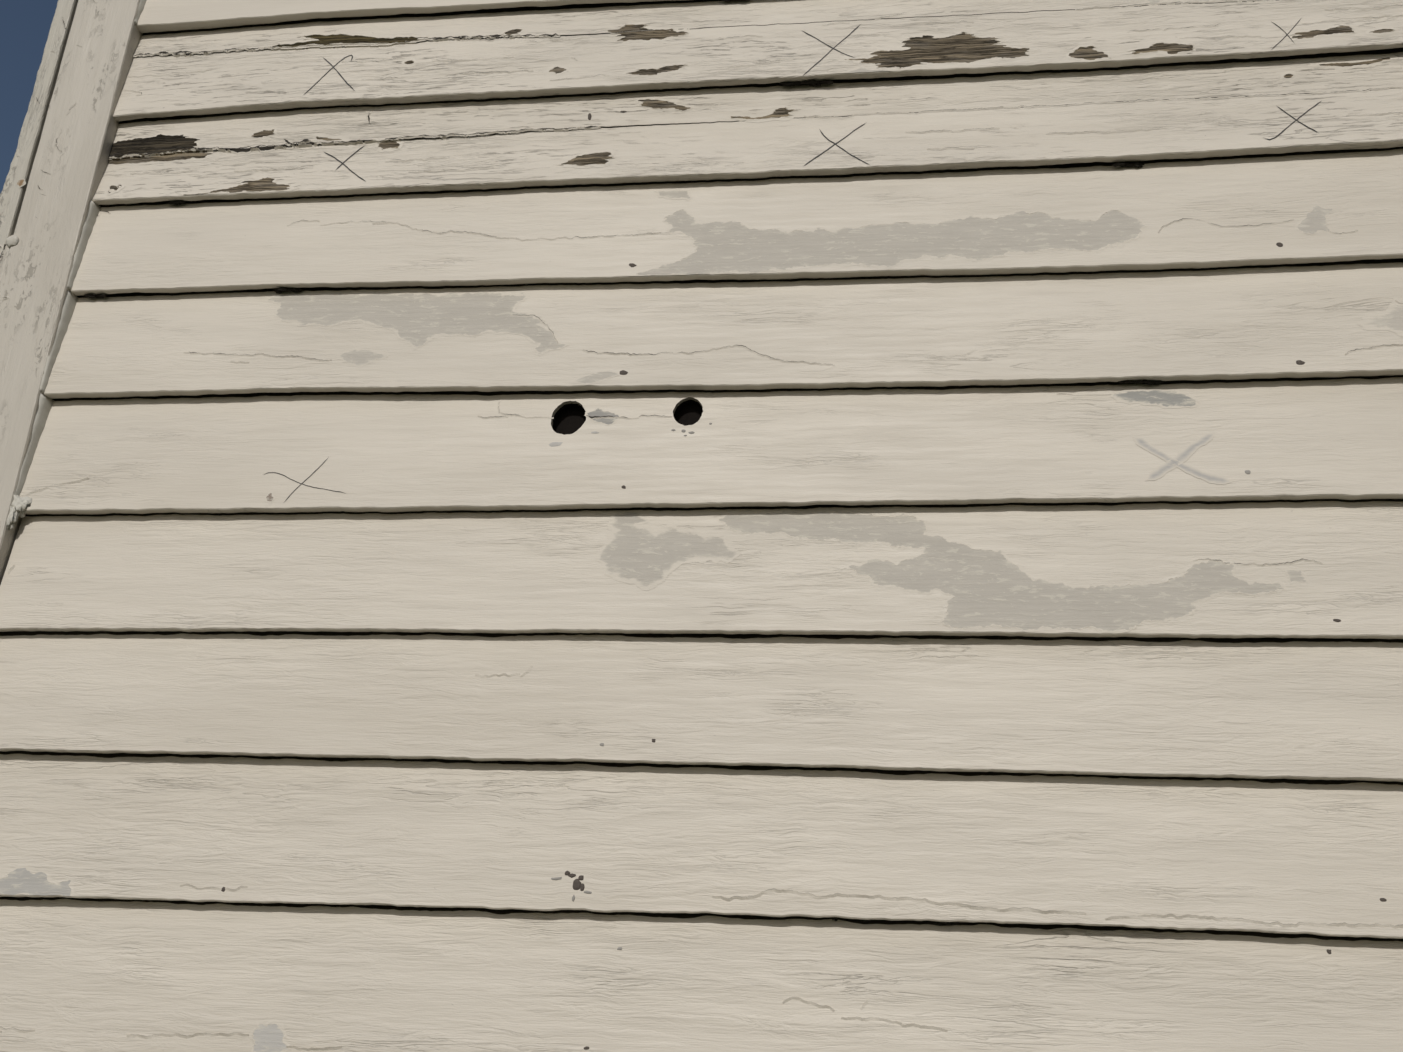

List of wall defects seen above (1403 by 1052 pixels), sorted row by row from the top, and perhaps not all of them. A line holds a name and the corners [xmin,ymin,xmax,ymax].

peeling [607,22,690,44]
peeling [1286,23,1402,42]
peeling [837,31,1030,73]
peeling [1064,40,1196,62]
peeling [108,109,601,164]
peeling [557,149,617,168]
peeling [178,175,301,196]
crack [287,220,661,241]
peeling [629,189,1147,276]
peeling [267,289,569,356]
peeling [595,509,1289,633]
peeling [0,865,75,896]